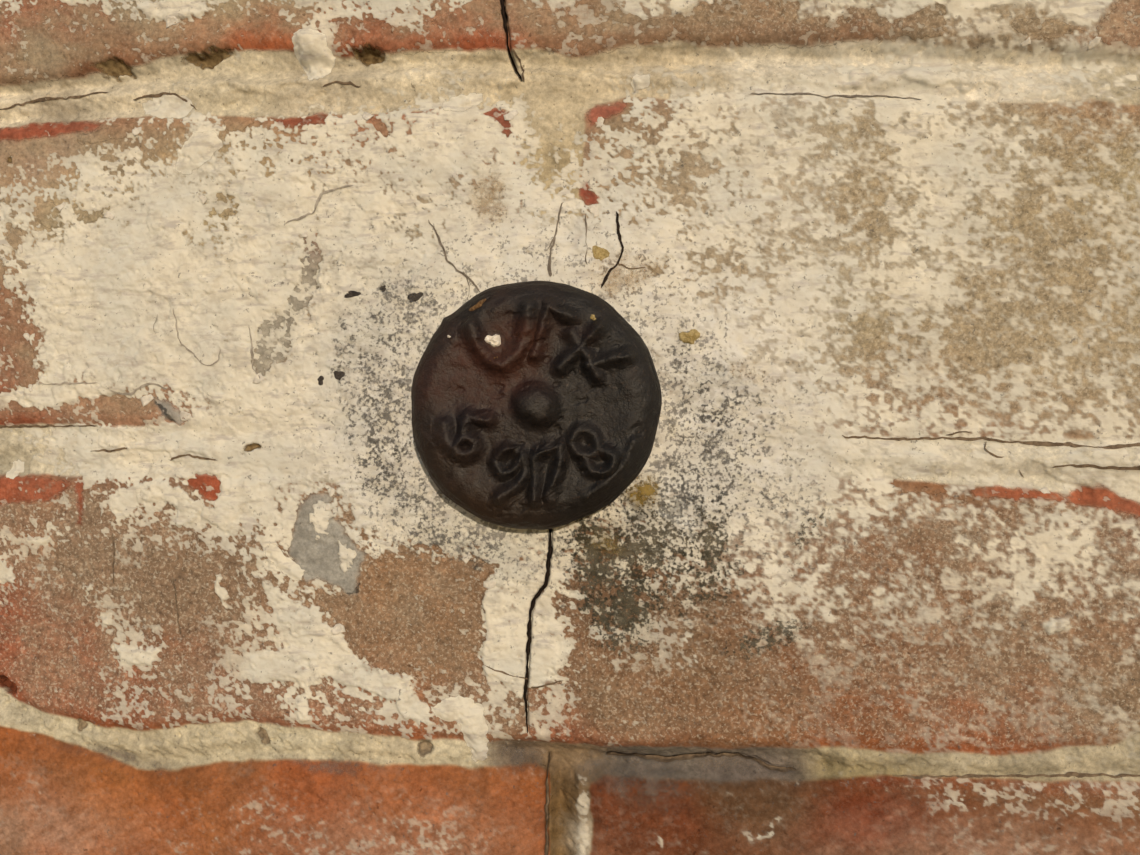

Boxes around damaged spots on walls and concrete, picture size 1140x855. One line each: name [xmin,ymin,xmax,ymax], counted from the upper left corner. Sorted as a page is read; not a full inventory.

peeling [0,0,301,85]
peeling [333,0,504,66]
crack [500,0,524,80]
peeling [518,0,946,56]
peeling [0,95,194,145]
peeling [0,222,38,393]
peeling [253,231,322,384]
peeling [0,394,191,427]
peeling [971,485,1140,518]
peeling [265,488,496,683]
crack [486,529,561,733]
crack [543,754,551,855]